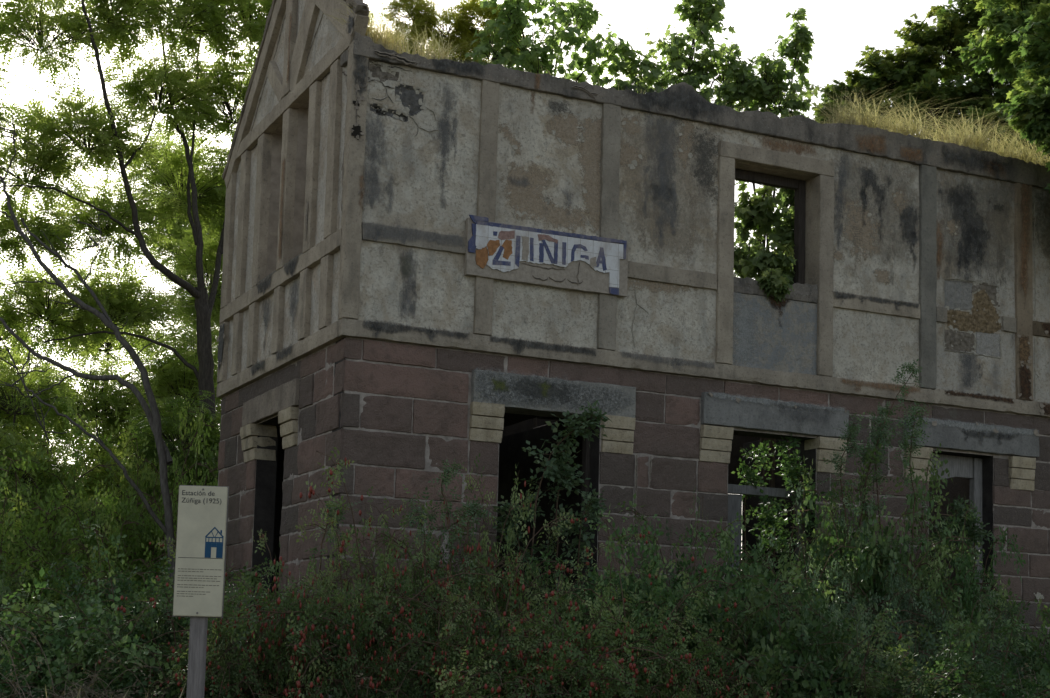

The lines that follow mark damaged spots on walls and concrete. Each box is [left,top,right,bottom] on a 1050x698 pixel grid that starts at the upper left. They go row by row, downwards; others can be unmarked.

crack [296,6,439,137]
spalling [346,15,427,122]
leakage [363,224,462,245]
leakage [860,169,891,239]
leakage [900,207,918,262]
leakage [939,186,989,280]
leakage [364,253,469,340]
spalling [943,282,1002,354]